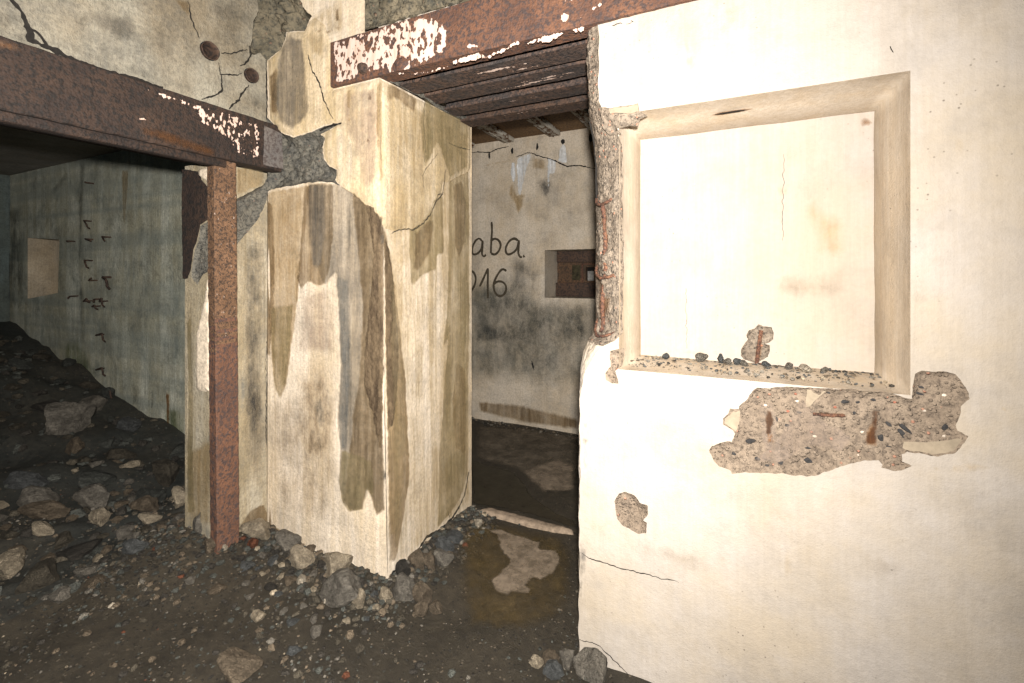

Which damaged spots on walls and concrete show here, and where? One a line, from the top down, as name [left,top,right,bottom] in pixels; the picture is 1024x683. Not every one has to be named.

crack [10,0,163,88]
crack [202,46,268,120]
crack [394,104,595,232]
water stain [511,154,530,192]
water stain [543,145,566,194]
peeling [159,0,648,507]
spalling [741,325,774,365]
water stain [392,362,408,535]
spalling [709,371,970,477]
spalling [615,492,648,534]
crack [582,553,679,583]